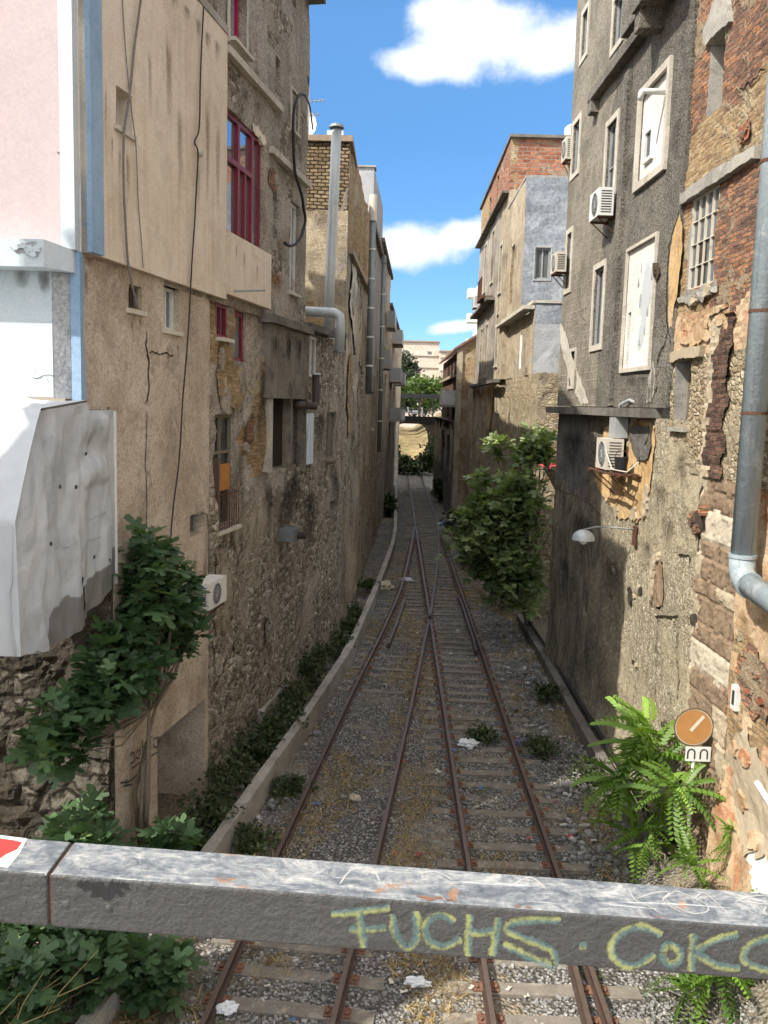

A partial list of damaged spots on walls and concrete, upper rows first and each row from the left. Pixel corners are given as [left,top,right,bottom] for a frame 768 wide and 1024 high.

spalling [737,117,752,144]
crack [145,331,174,524]
peeling [594,362,658,523]
spalling [687,504,708,535]